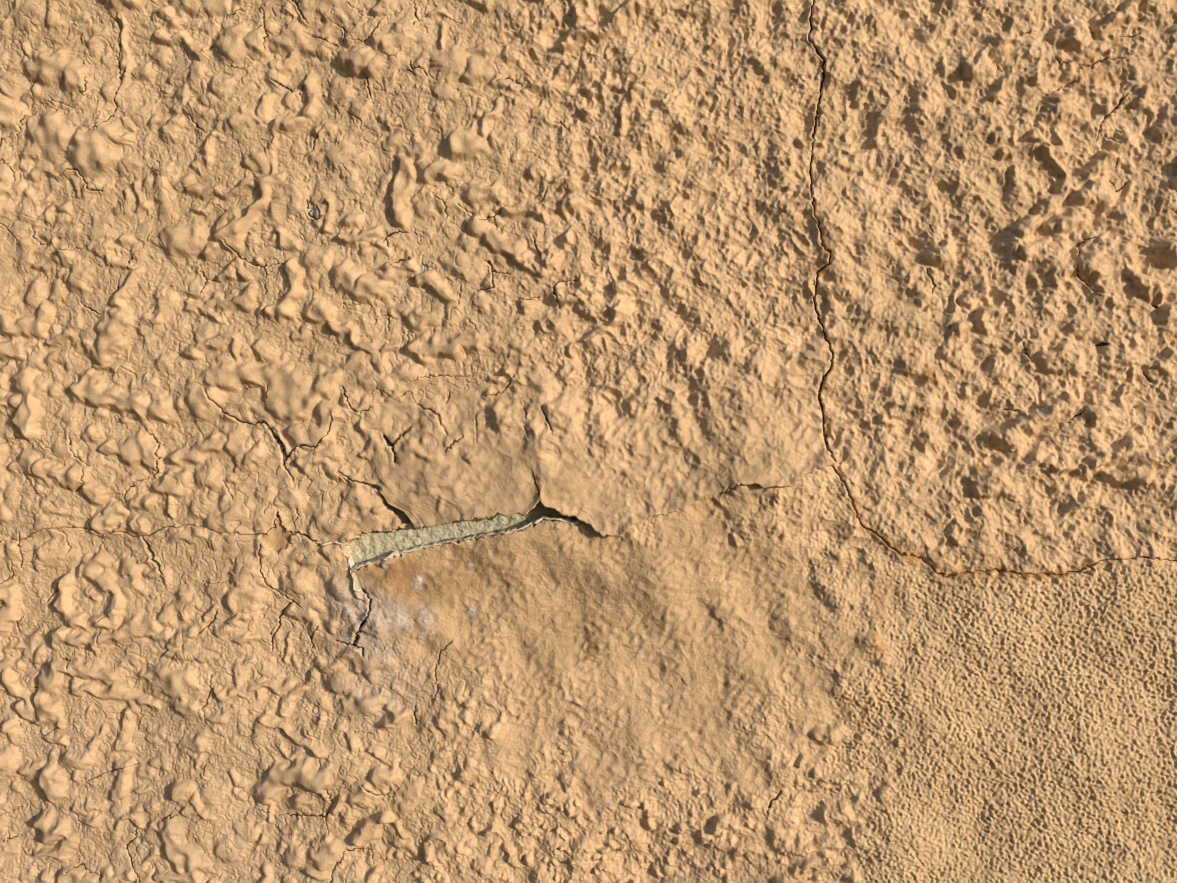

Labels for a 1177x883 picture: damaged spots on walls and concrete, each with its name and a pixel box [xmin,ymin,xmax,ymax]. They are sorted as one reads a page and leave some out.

crack [808,0,1177,578]
crack [5,435,88,492]
crack [124,430,161,499]
crack [339,471,380,490]
crack [206,374,553,481]
flaking render [316,336,836,592]
crack [0,506,372,655]
efflorescence [413,575,424,589]
efflorescence [334,585,433,659]